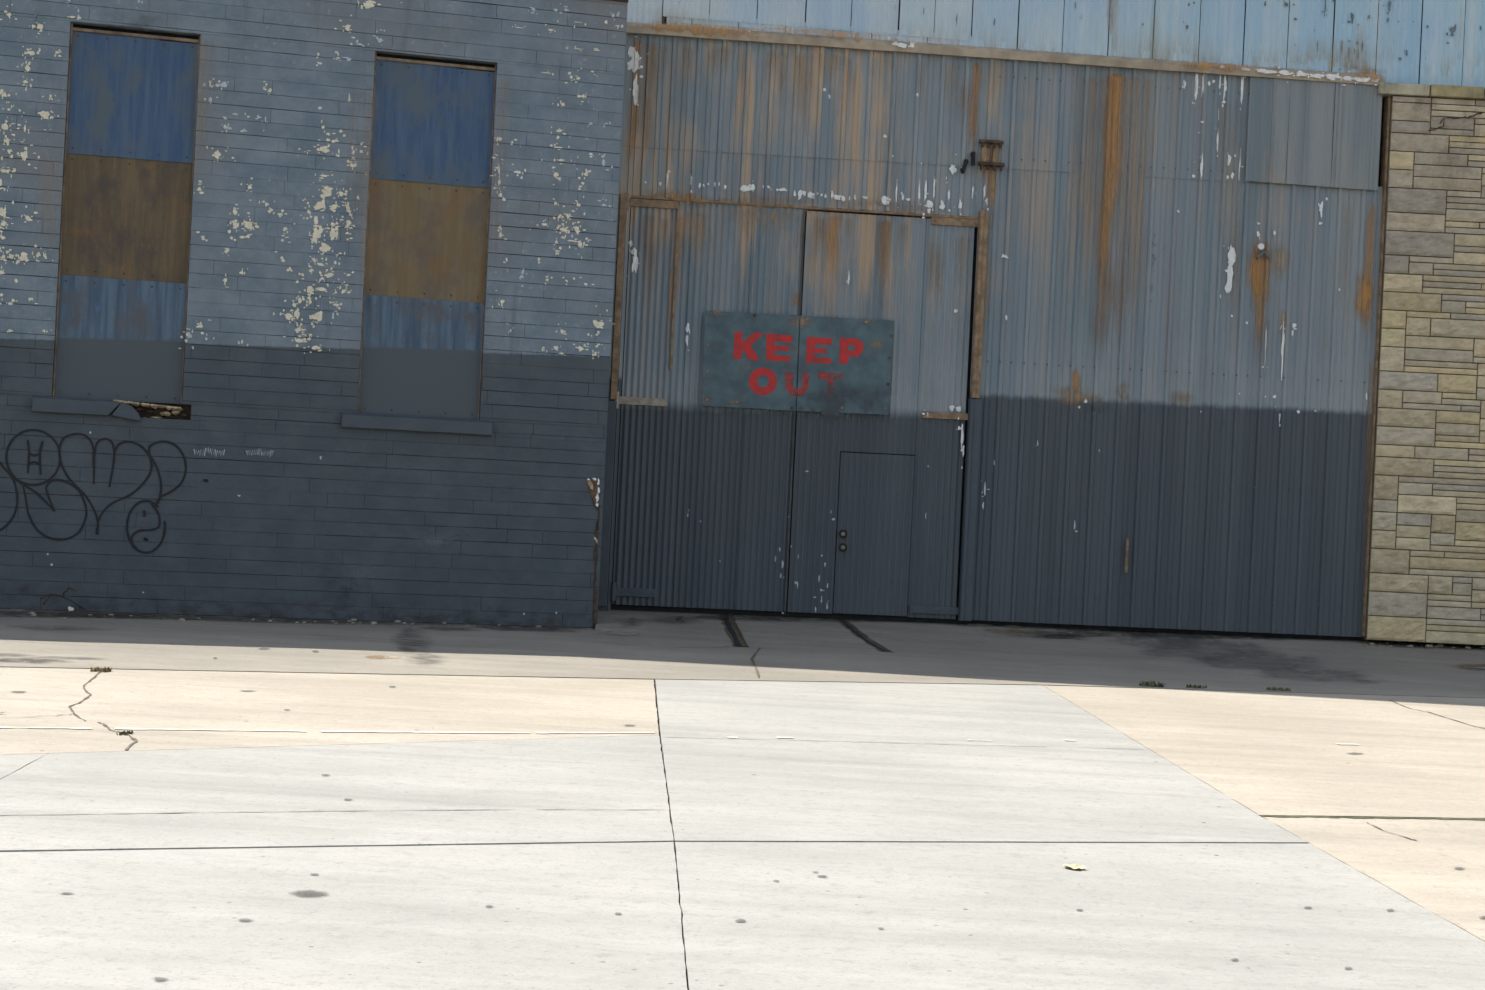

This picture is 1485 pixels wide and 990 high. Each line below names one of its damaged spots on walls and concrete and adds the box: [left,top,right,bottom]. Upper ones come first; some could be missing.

corrosion [645,23,759,37]
peeling [0,4,62,305]
peeling [222,106,368,354]
peeling [490,126,613,287]
peeling [690,154,989,219]
corrosion [969,65,995,200]
corrosion [1099,75,1145,304]
peeling [1220,246,1236,298]
corrosion [1249,246,1285,330]
corrosion [1356,210,1373,318]
spalling [112,399,191,421]
crack [6,671,138,750]